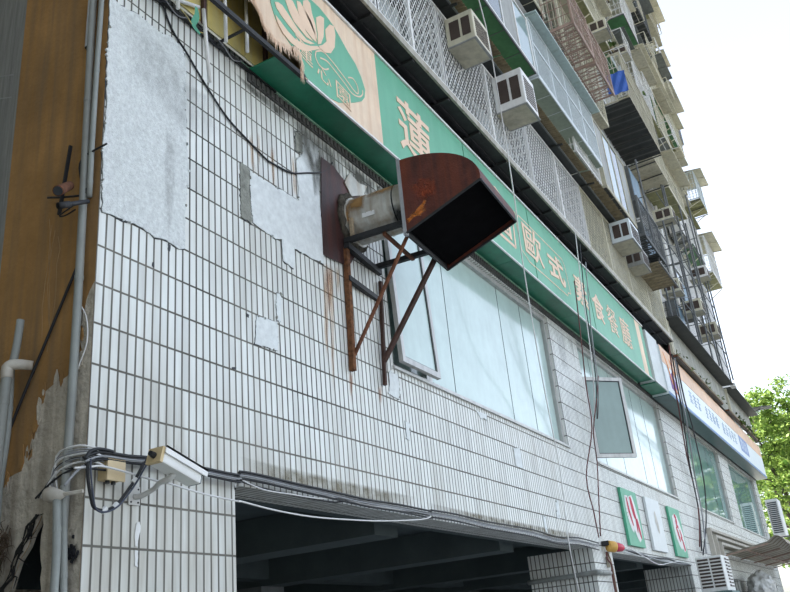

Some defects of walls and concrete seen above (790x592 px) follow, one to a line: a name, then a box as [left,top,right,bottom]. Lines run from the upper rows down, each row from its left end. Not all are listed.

peeling [0,281,95,592]
peeling [101,0,190,252]
flaking render [246,292,282,351]
peeling [239,130,324,269]